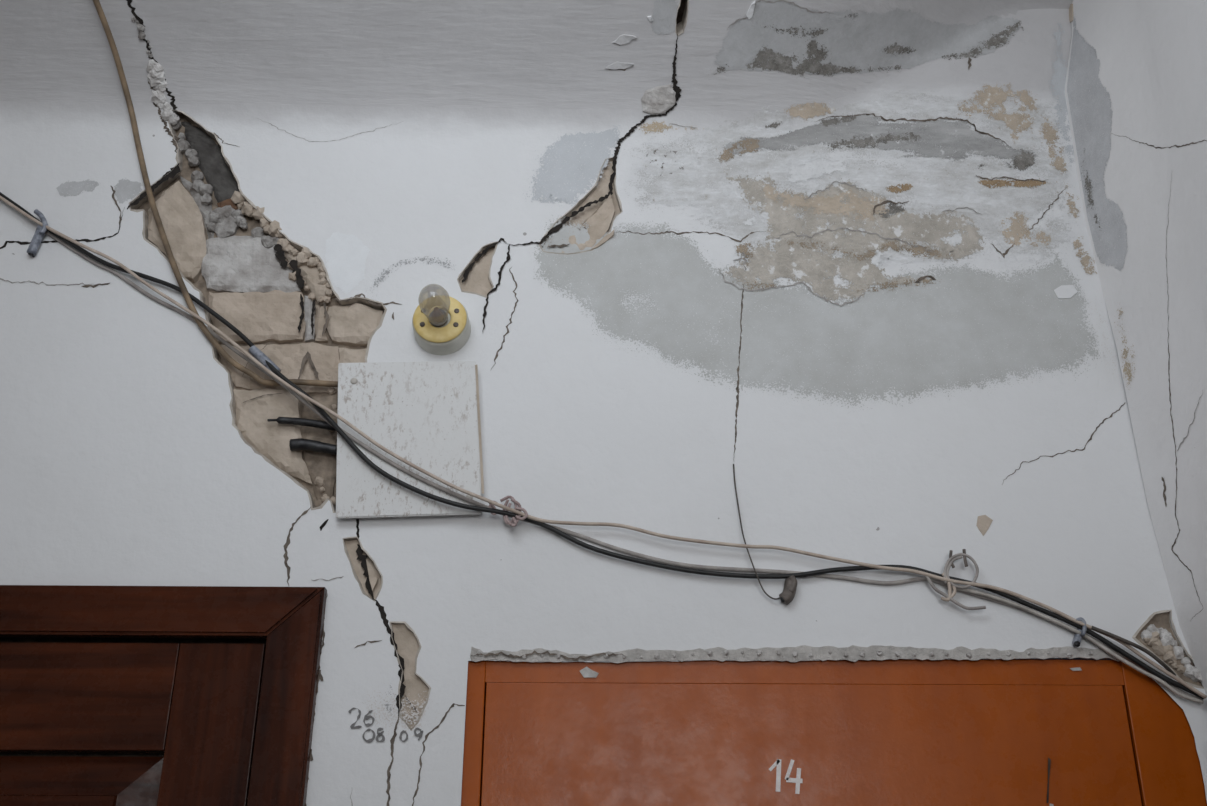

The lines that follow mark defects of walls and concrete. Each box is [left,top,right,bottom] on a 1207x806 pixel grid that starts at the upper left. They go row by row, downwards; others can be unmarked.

crack [0,0,181,249]
flaking render [129,109,387,513]
flaking render [539,157,623,255]
crack [482,0,689,369]
crack [619,231,766,242]
flaking render [708,0,1024,78]
flaking render [718,113,1038,306]
crack [1162,179,1203,614]
crack [283,507,359,585]
flaking render [343,536,383,601]
flaking render [389,621,431,731]
crack [355,596,465,806]